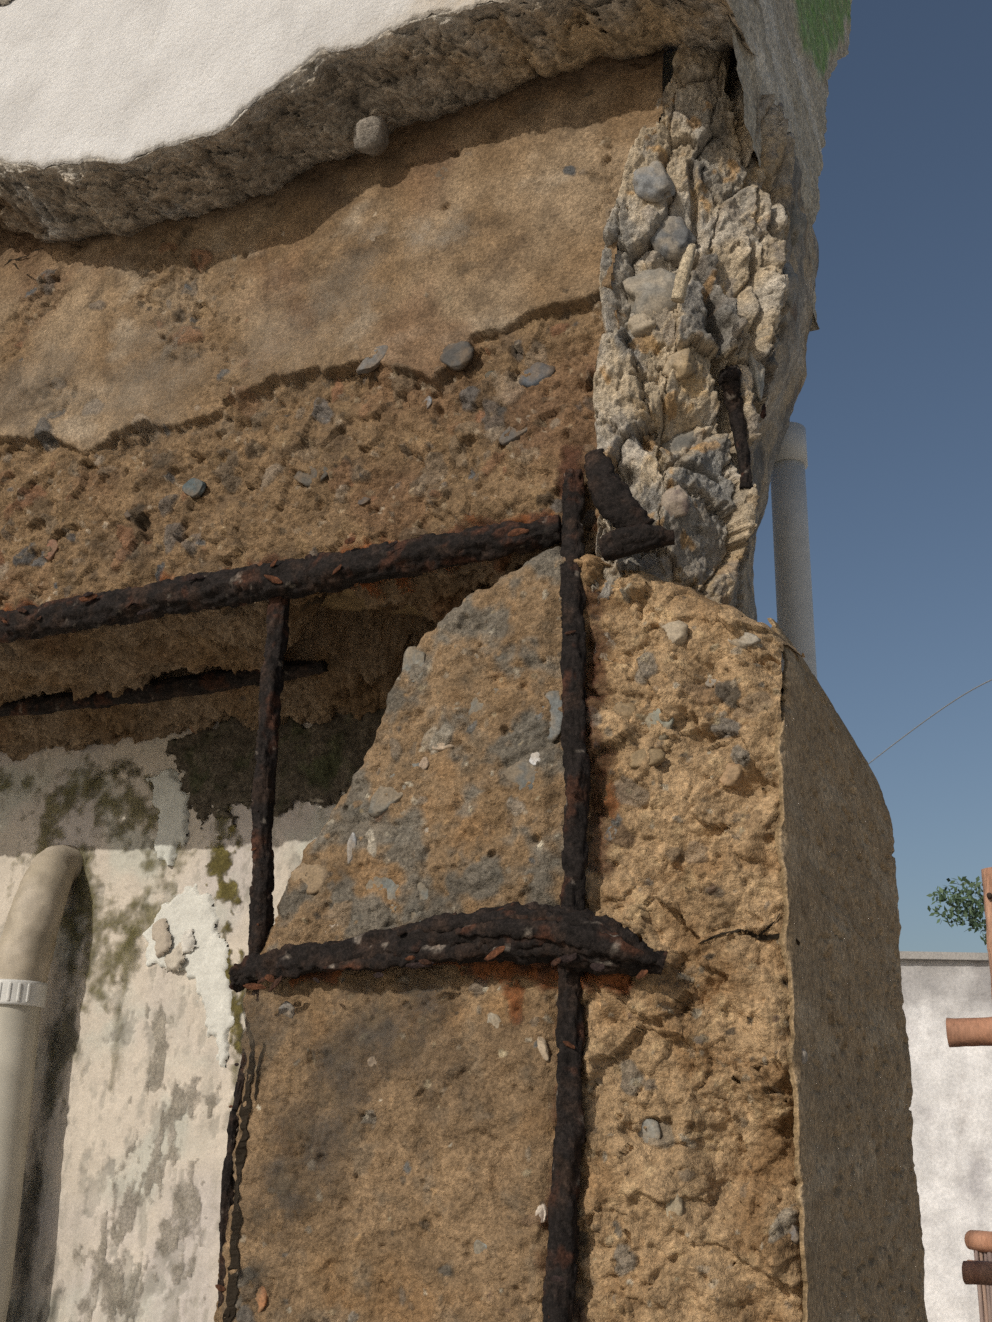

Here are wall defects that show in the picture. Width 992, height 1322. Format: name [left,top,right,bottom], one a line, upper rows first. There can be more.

corrosion [332,537,398,575]
spalling [0,42,819,1322]
damp [96,762,154,791]
corrosion [243,901,657,1023]
damp [45,1010,78,1119]
damp [73,1004,238,1322]
damp [15,1169,40,1283]